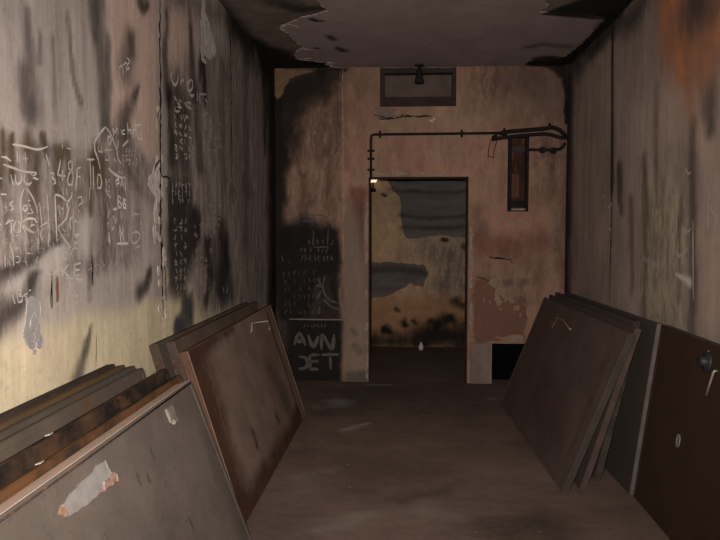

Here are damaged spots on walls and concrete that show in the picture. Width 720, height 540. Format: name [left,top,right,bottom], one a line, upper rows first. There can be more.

peeling [275,0,605,99]
water stain [275,97,288,247]
peeling [23,295,44,354]
water stain [340,206,464,382]
spalling [364,172,528,343]